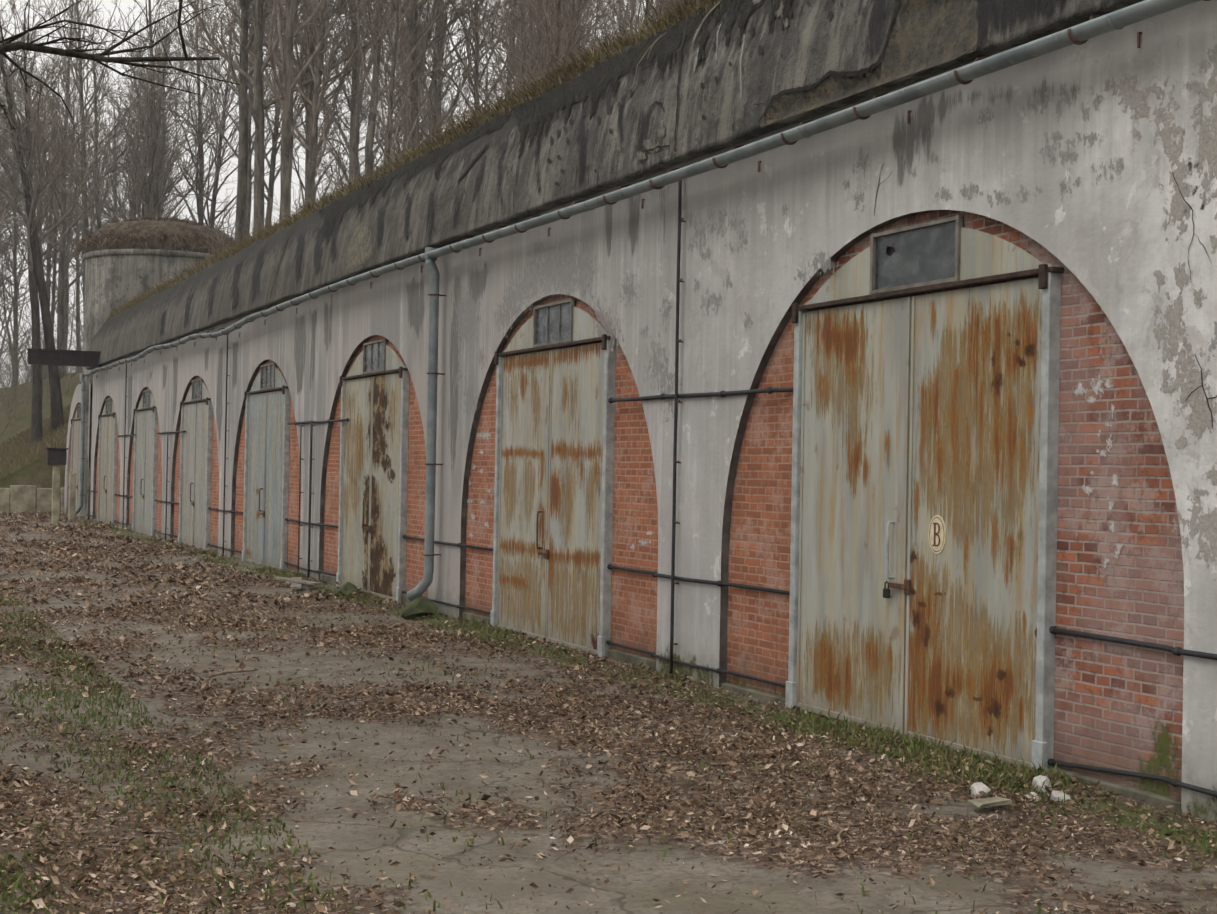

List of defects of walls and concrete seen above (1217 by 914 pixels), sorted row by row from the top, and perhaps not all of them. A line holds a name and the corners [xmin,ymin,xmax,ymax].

leakage [574,101,589,184]
leakage [606,90,663,152]
crack [750,0,900,123]
leakage [858,0,898,60]
leakage [629,195,640,253]
crack [1172,172,1211,279]
peeling [1153,262,1217,449]
crack [1185,355,1217,429]
corrosion [344,375,396,597]
corrosion [499,343,603,650]
corrosion [804,289,1042,750]
peeling [1170,457,1217,582]